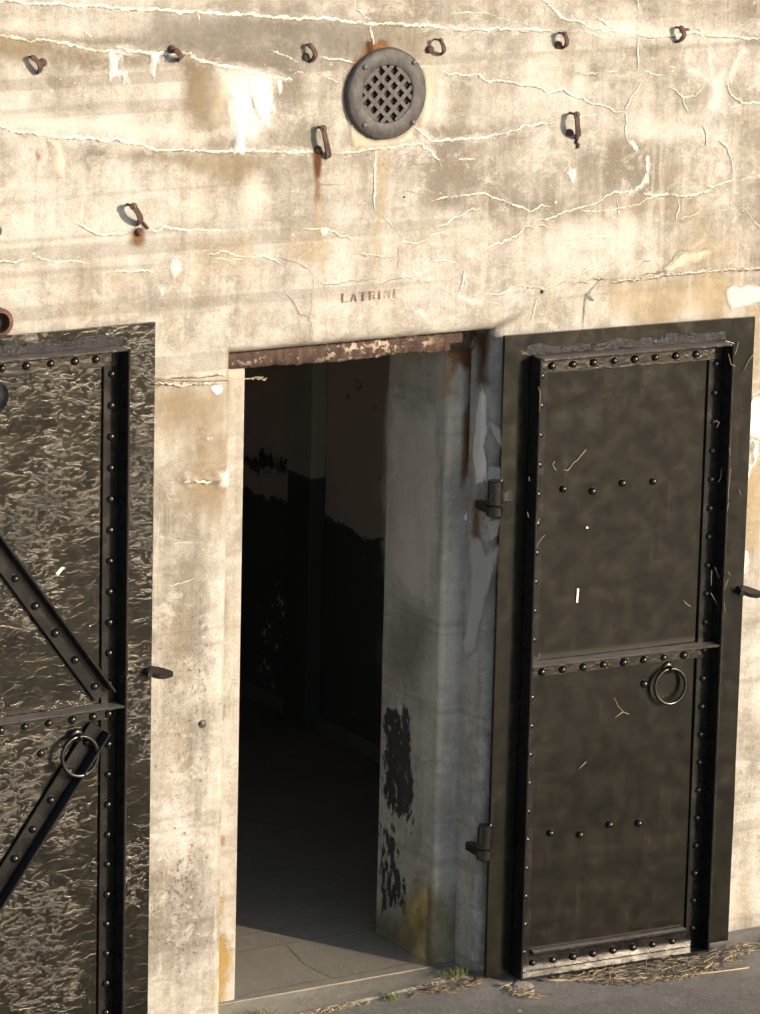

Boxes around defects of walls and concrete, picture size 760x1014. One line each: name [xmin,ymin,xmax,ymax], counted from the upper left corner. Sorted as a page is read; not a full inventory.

rust [314,152,322,201]
crack [0,0,760,335]
spalling [574,266,760,301]
peeling [243,447,287,476]
rust [449,329,488,483]
peeling [379,700,416,915]